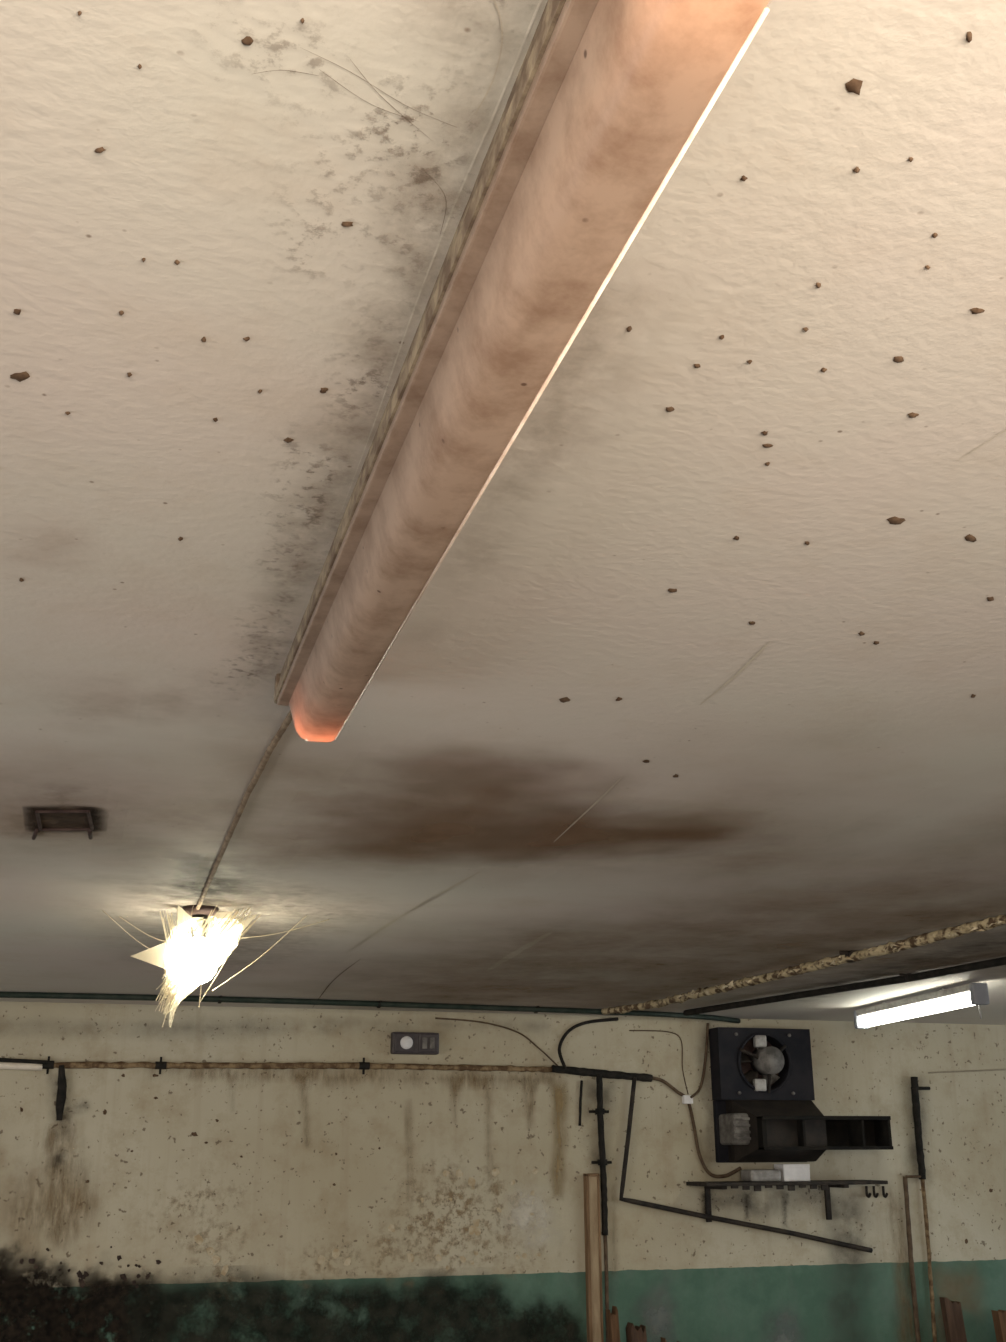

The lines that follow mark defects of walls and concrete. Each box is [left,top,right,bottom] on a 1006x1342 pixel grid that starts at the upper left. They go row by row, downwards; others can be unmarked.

damp [360,787,712,853]
peeling [818,921,1005,965]
peeling [652,969,800,1003]